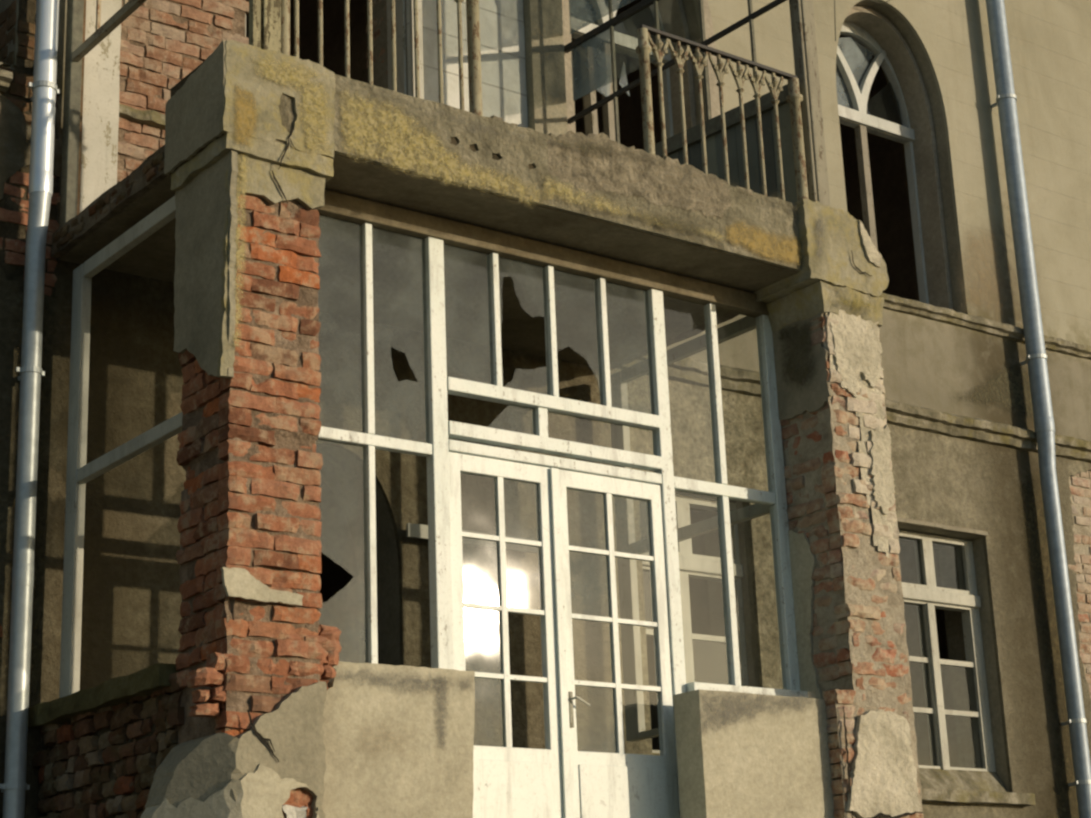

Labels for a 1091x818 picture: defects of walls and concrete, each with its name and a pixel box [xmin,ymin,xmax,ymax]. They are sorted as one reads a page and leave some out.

spalling [0,165,30,281]
spalling [0,0,36,126]
crack [272,128,296,203]
water stain [255,60,803,263]
spalling [32,94,342,818]
peeling [772,309,924,818]
spalling [1068,471,1091,698]